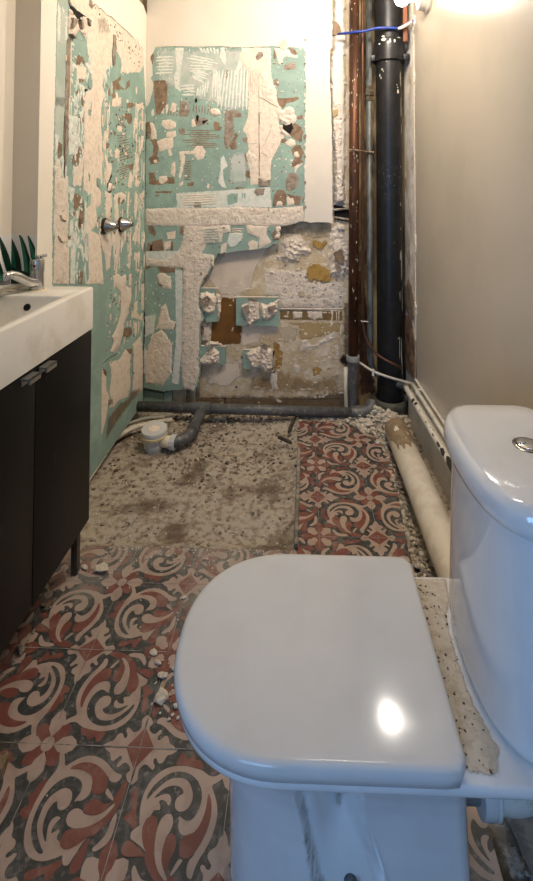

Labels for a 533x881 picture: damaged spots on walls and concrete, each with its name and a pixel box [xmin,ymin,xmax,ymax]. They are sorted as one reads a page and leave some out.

peeling [58,9,94,285]
peeling [100,51,206,225]
peeling [145,231,178,262]
peeling [143,270,183,385]
flaking render [242,326,277,346]
spalling [278,416,296,444]